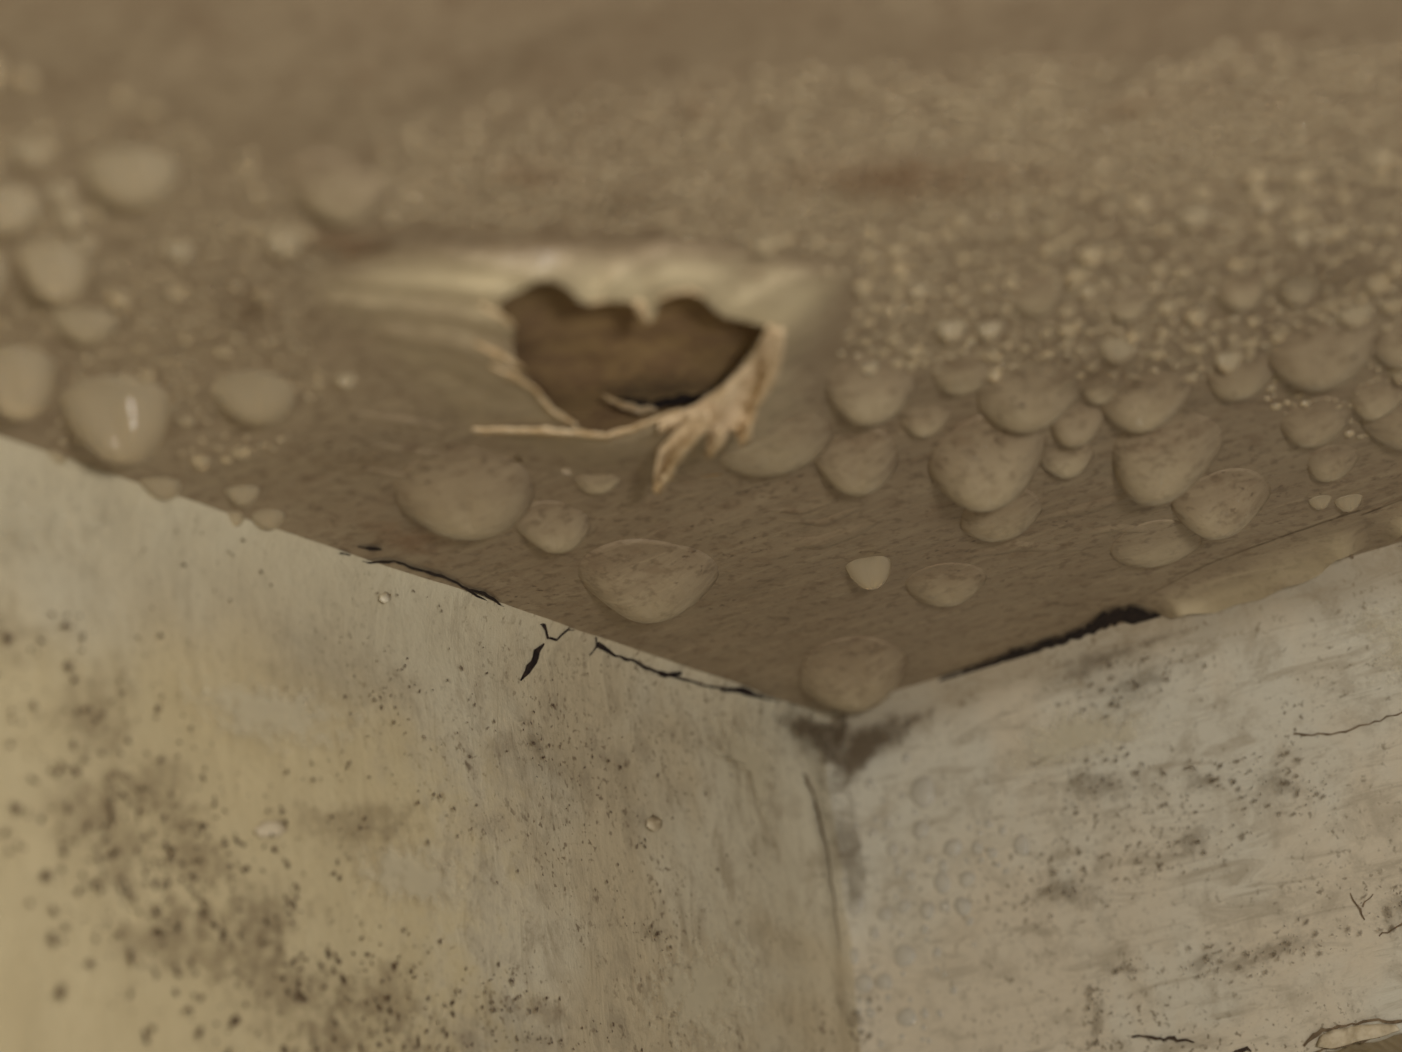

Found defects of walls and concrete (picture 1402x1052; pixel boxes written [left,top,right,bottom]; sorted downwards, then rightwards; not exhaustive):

crack [339,546,504,607]
crack [540,623,807,711]
crack [938,606,1162,682]
leakage [792,714,915,780]
crack [1294,712,1402,736]
leakage [1052,746,1327,874]
mould [2,670,614,1052]
leakage [1181,916,1362,983]
crack [1131,1035,1194,1043]
crack [1234,1044,1252,1052]
peeling [1316,1024,1400,1049]